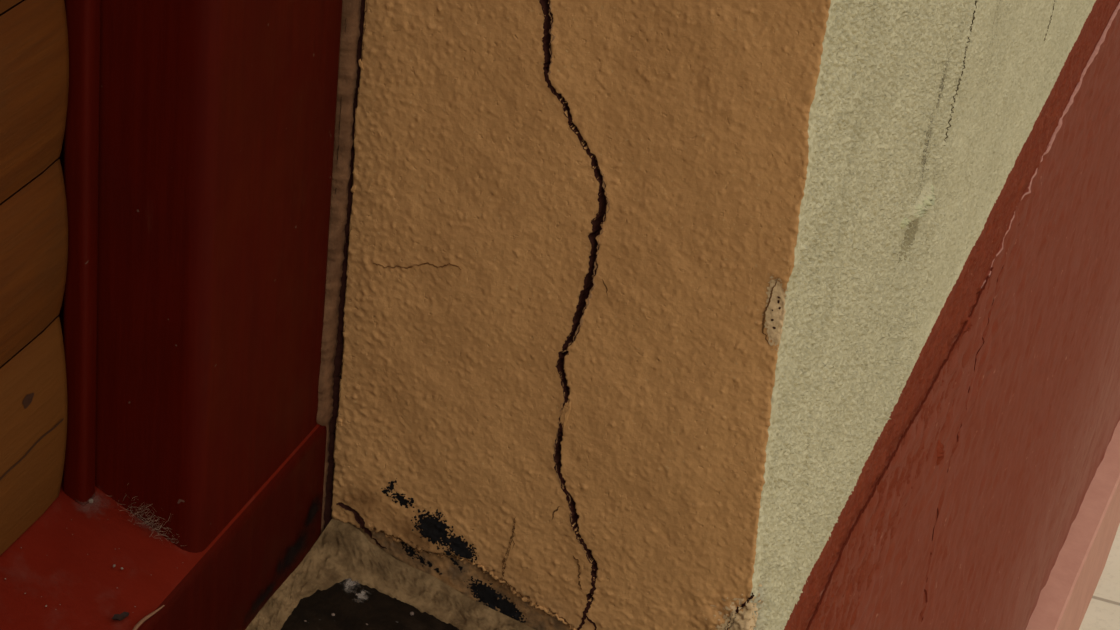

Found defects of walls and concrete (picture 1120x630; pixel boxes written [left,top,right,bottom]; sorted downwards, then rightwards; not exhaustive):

crack [539,0,610,630]
spalling [762,274,788,351]